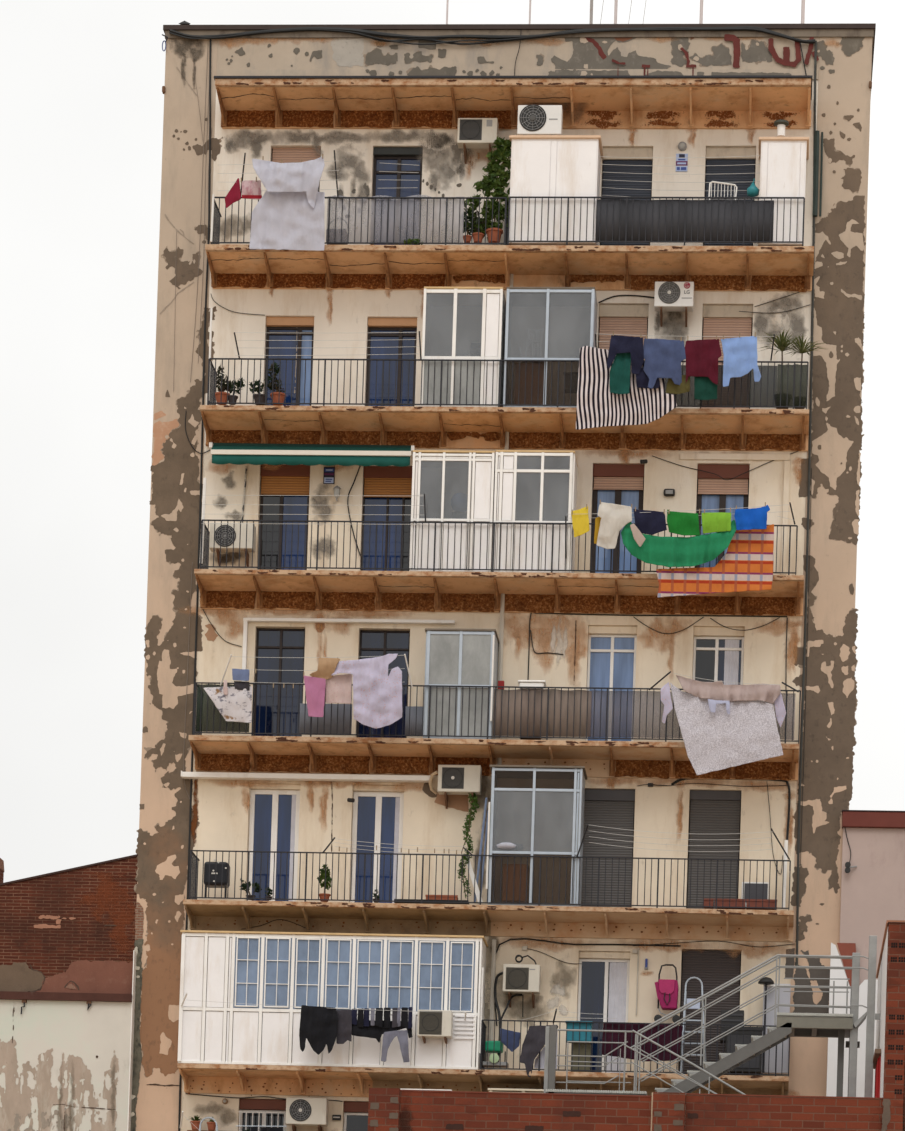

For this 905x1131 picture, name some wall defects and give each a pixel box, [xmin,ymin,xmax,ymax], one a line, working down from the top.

peeling [291,48,322,67]
peeling [363,37,791,85]
damp [226,131,271,157]
damp [287,131,363,154]
damp [329,156,369,203]
damp [381,129,469,189]
peeling [131,101,866,1131]
damp [551,627,567,663]
peeling [0,1039,119,1131]